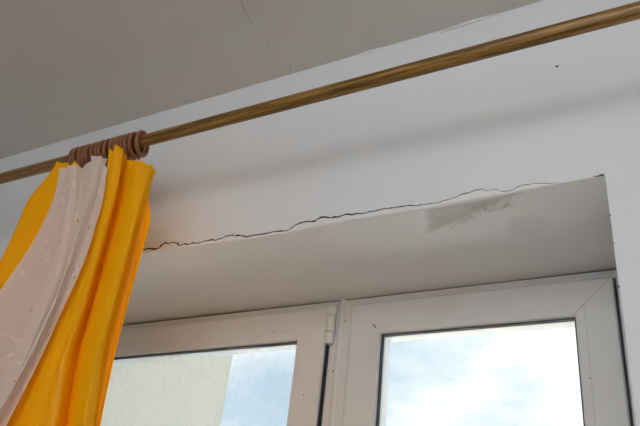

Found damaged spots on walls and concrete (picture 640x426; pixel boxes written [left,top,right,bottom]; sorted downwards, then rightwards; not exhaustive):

crack [143,182,558,250]